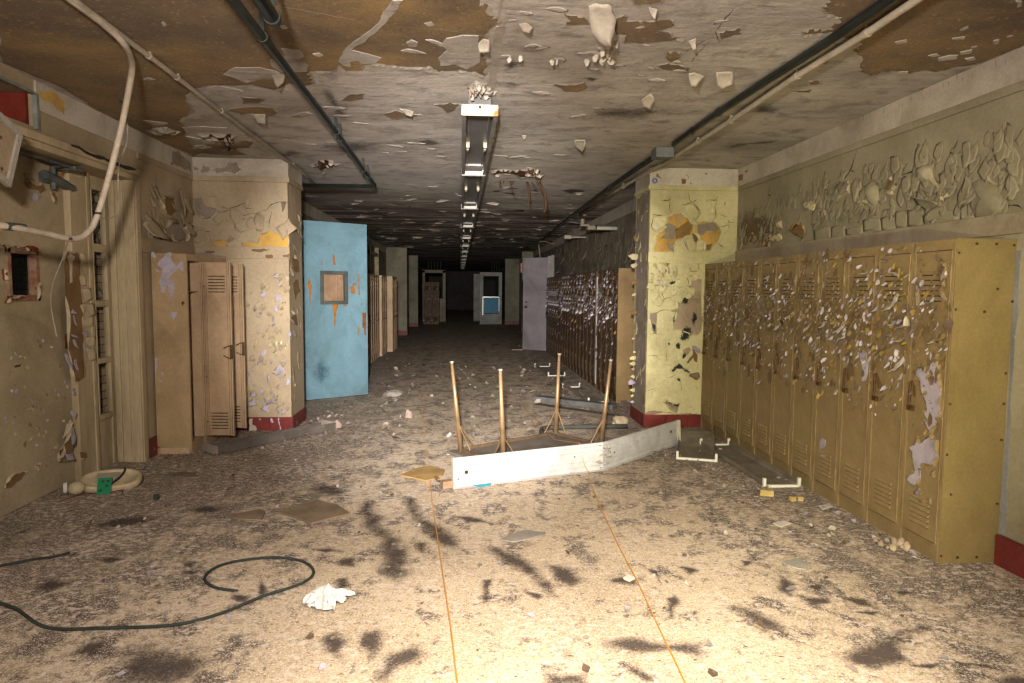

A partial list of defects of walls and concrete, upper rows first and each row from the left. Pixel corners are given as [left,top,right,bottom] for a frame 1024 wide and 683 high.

peeling [0,0,733,175]
peeling [714,20,743,40]
peeling [801,0,1024,76]
peeling [2,251,96,508]
peeling [151,122,1024,502]
crack [651,173,740,313]